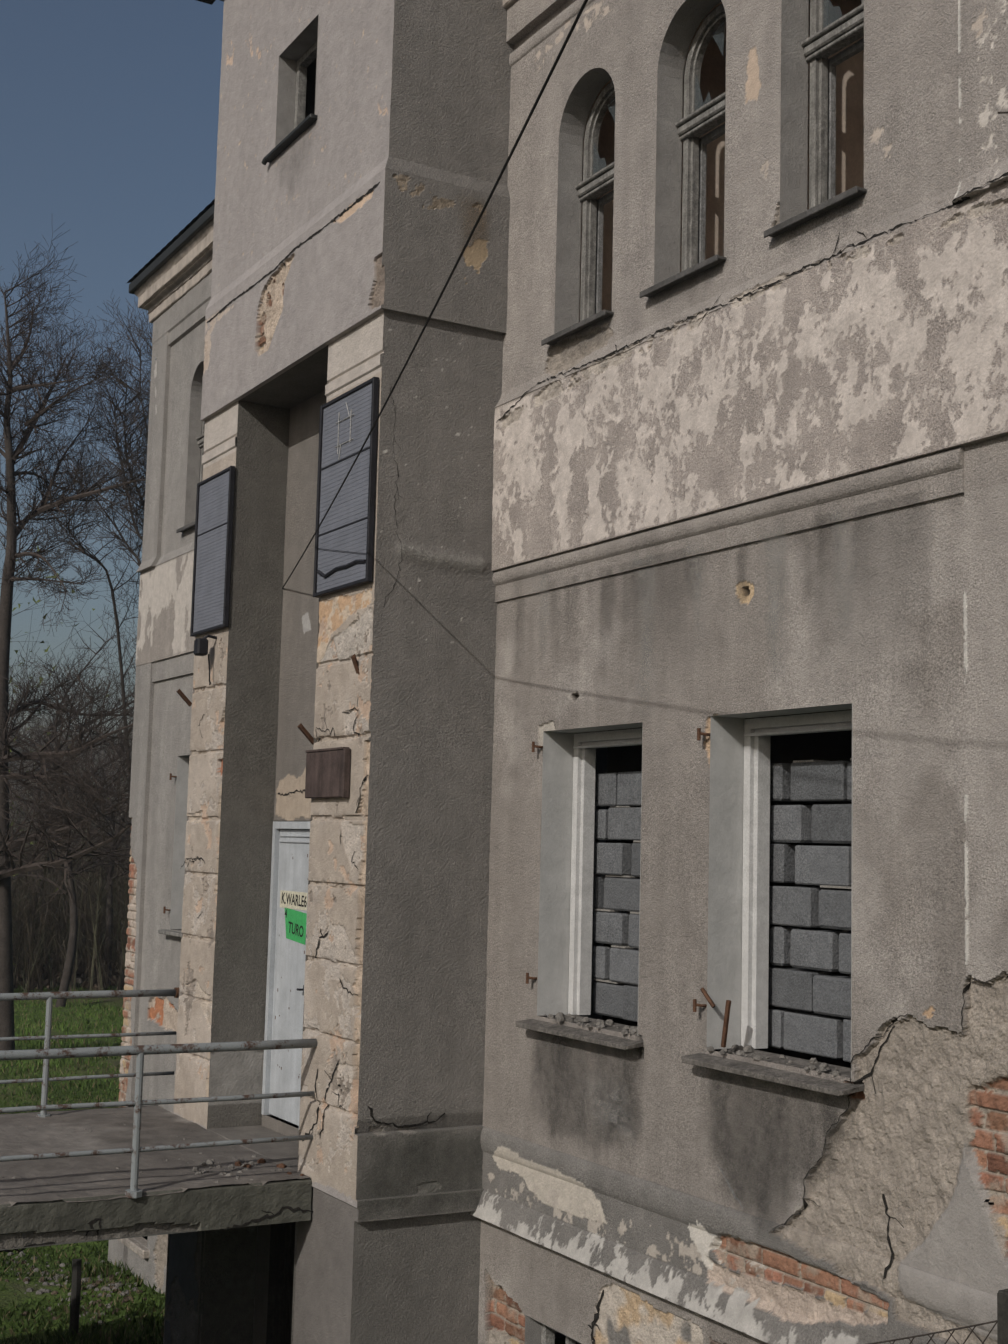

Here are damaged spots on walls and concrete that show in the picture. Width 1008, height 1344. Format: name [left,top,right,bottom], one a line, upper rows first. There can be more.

peeling [492,185,1008,563]
crack [496,172,1008,423]
flaking render [118,822,137,1107]
peeling [184,639,228,948]
peeling [149,963,264,1105]
flaking render [299,590,415,1172]
crack [302,1060,445,1141]
flaking render [470,846,1008,1344]
water stain [714,1084,836,1213]
crack [773,1014,907,1229]
crack [882,1194,904,1279]
crack [960,975,1008,1035]